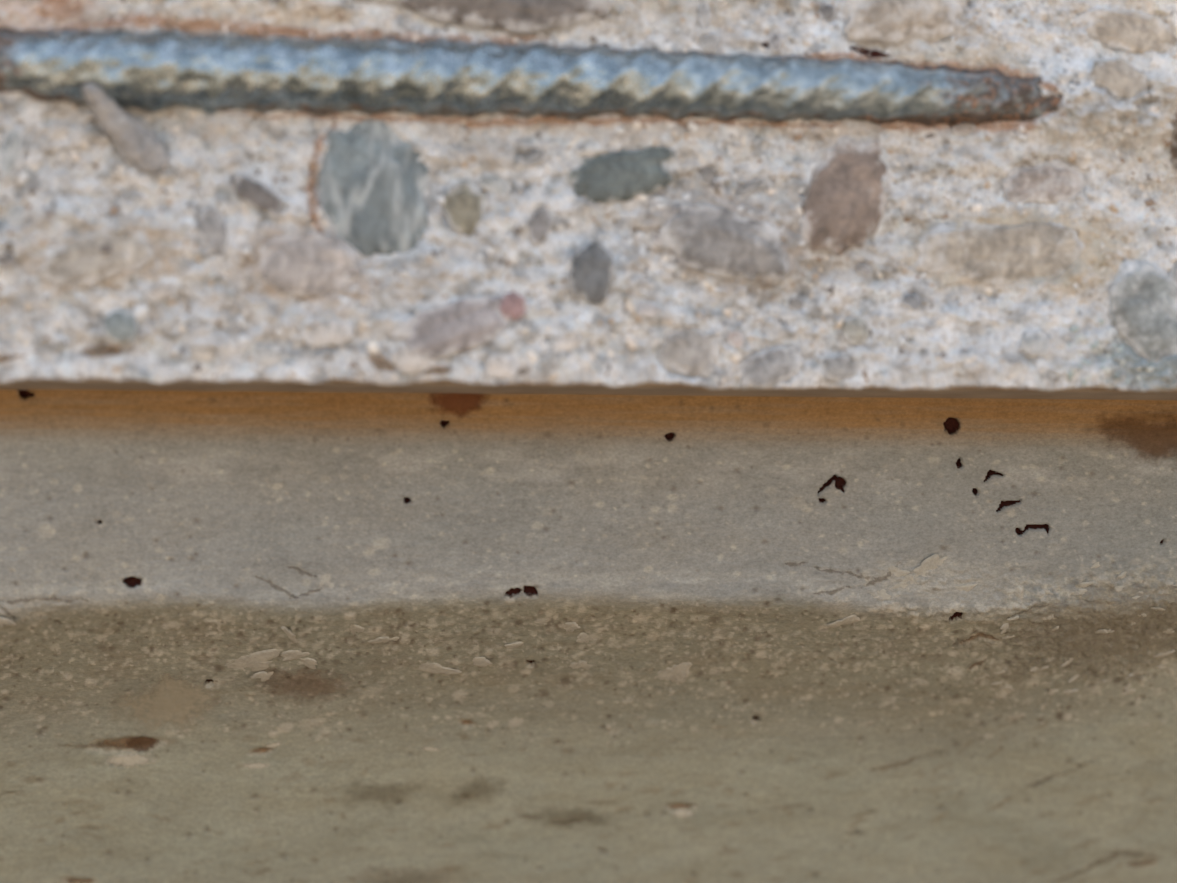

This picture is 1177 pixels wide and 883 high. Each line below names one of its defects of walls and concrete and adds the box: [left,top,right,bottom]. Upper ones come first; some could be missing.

spalling [0,0,1177,393]